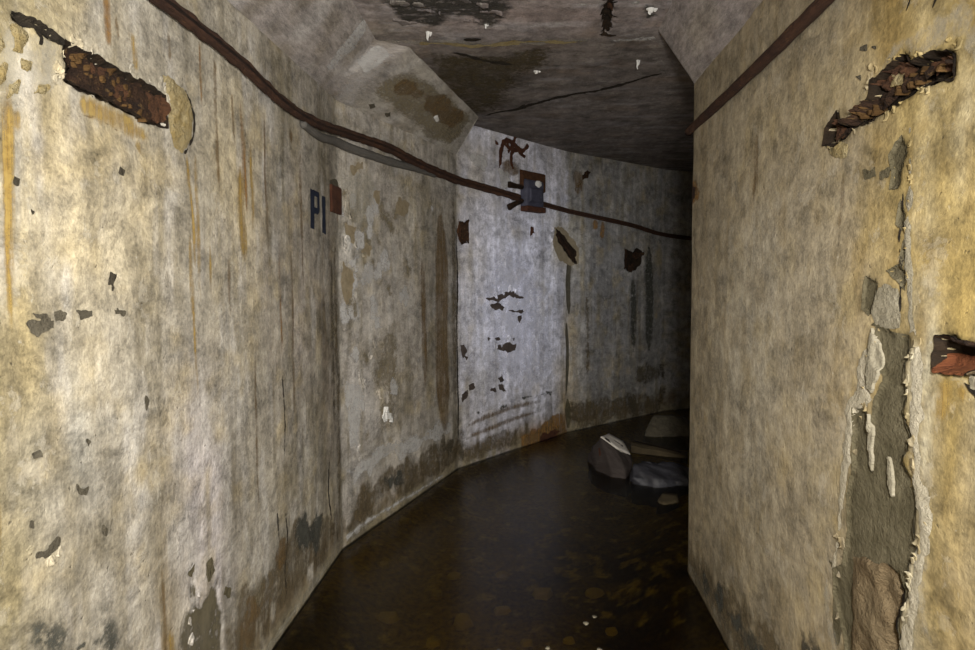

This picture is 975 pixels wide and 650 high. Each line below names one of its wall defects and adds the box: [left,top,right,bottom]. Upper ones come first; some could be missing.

flaking render [0,23,33,98]
crack [485,73,661,116]
spalling [822,36,963,159]
spalling [34,34,196,250]
rust [495,137,529,175]
rust [2,105,20,309]
spalling [549,226,579,266]
spalling [624,248,644,273]
peeling [486,285,524,323]
peeling [831,128,975,650]
flaking render [26,536,63,567]